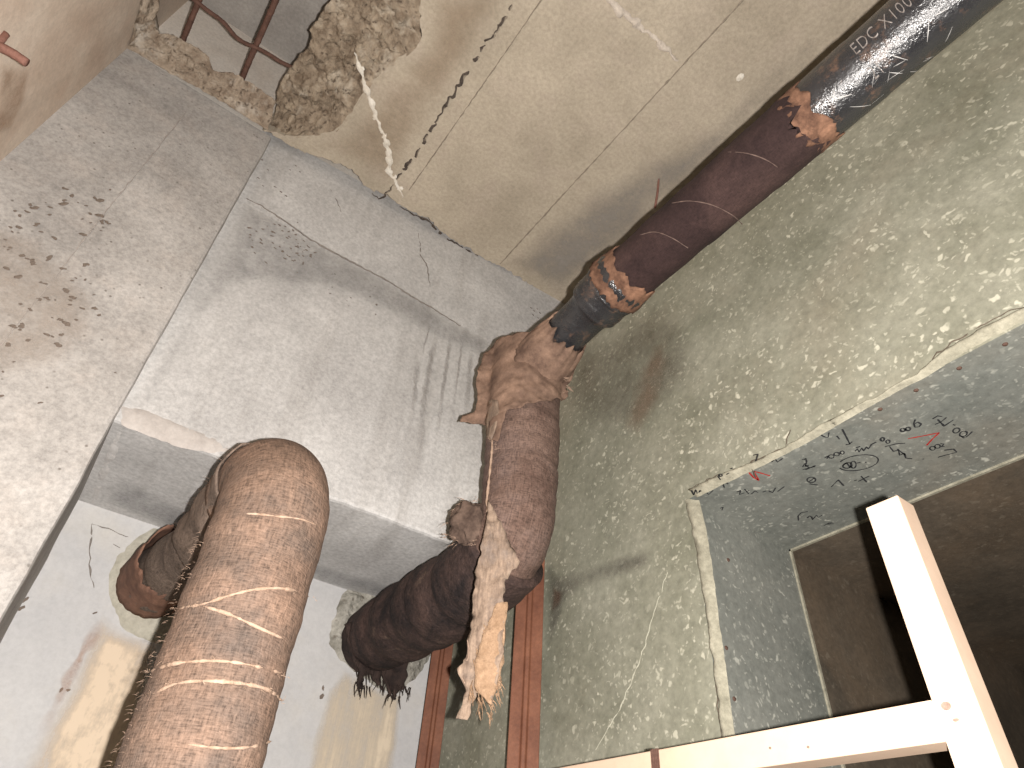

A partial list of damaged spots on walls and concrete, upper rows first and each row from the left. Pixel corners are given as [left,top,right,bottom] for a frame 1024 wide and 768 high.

spalling [127,0,421,138]
crack [354,4,513,283]